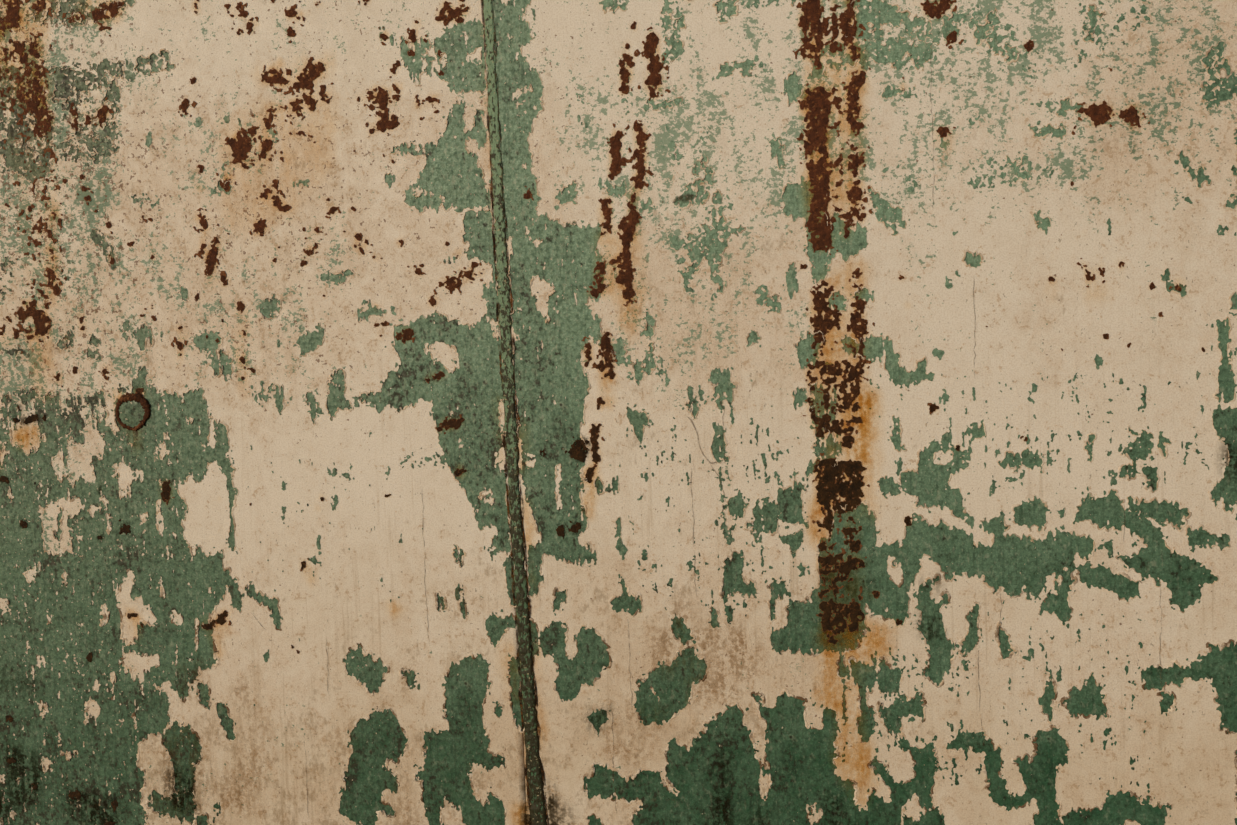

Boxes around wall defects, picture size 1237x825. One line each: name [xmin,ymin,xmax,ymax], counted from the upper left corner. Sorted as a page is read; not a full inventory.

corrosion [0,0,124,354]
peeling [0,48,176,186]
corrosion [225,57,333,169]
corrosion [586,120,653,307]
corrosion [618,21,670,101]
peeling [754,133,910,314]
corrosion [793,0,873,269]
peeling [780,0,1039,107]
peeling [0,320,283,825]
peeling [245,0,670,825]
corrosion [803,268,880,645]
peeling [582,291,1237,825]